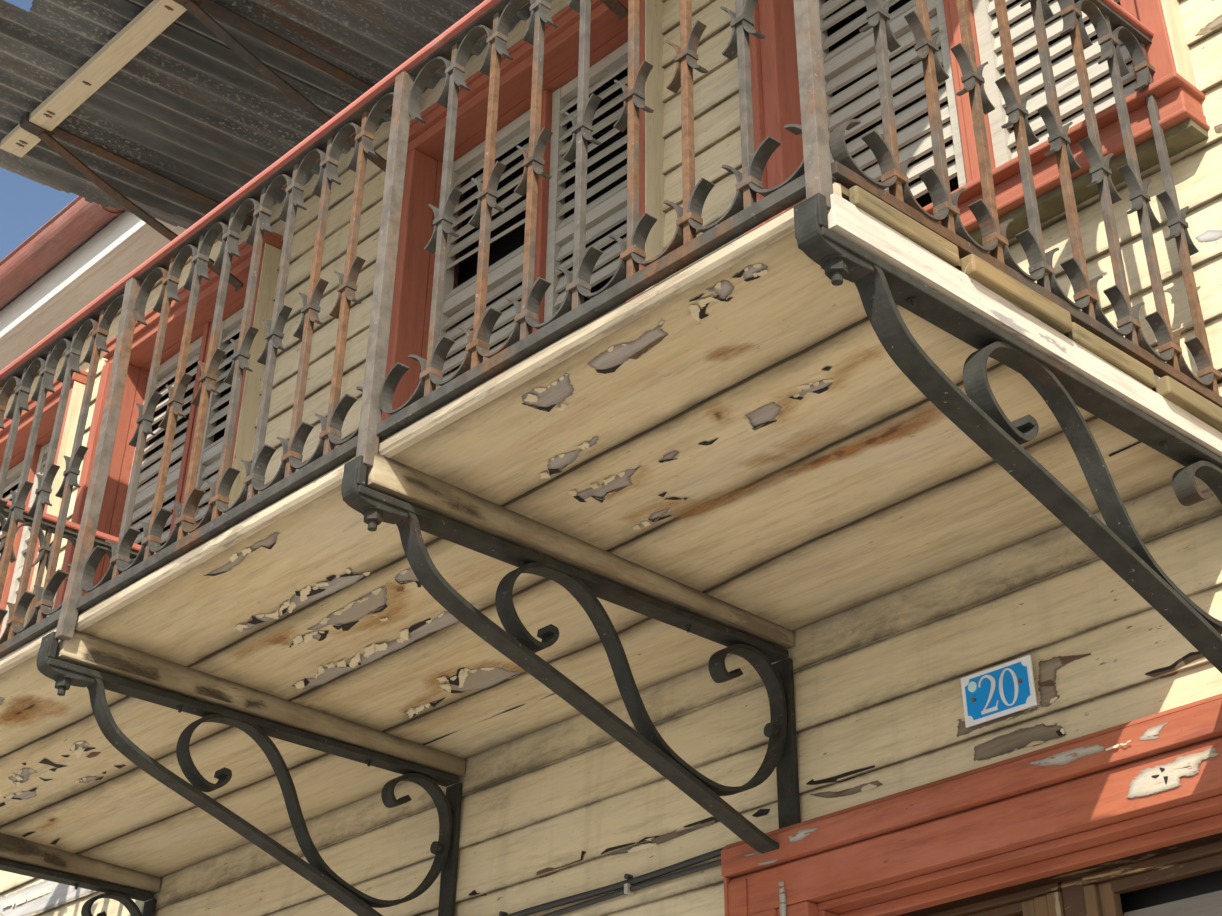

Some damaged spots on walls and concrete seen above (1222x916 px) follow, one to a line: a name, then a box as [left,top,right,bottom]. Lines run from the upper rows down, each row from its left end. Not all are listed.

peeling [588,318,668,374]
peeling [521,374,574,412]
peeling [742,366,834,432]
rust [796,409,934,472]
peeling [568,465,642,503]
rust [664,486,755,517]
peeling [235,568,421,648]
peeling [291,611,460,689]
peeling [405,667,520,718]
peeling [956,653,1168,766]
peeling [0,741,101,807]
peeling [1126,747,1219,798]